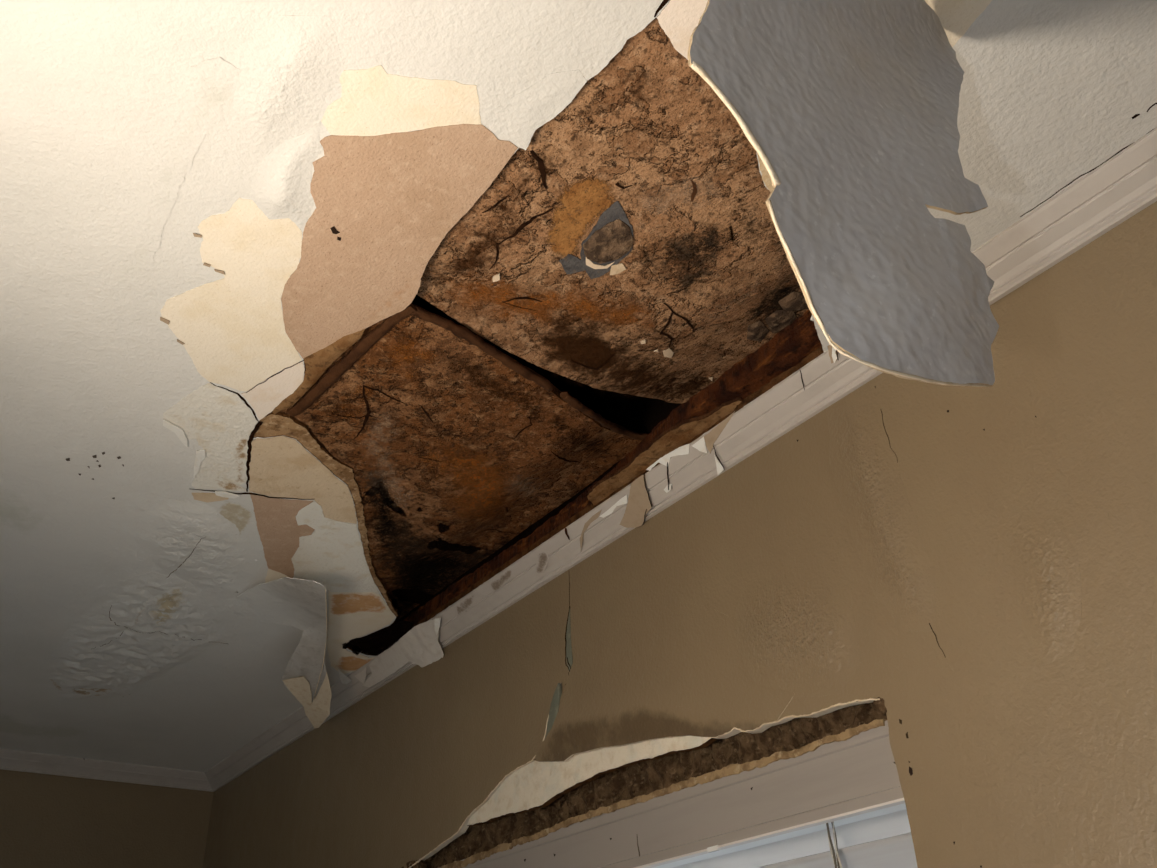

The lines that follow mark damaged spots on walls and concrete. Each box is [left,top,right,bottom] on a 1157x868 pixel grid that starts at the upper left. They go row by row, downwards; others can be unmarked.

crack [654,0,669,17]
peeling [547,178,634,279]
peeling [160,65,518,595]
crack [192,360,313,503]
peeling [580,411,735,550]
peeling [355,617,444,687]
water stain [533,704,774,762]
flaking render [401,697,908,868]